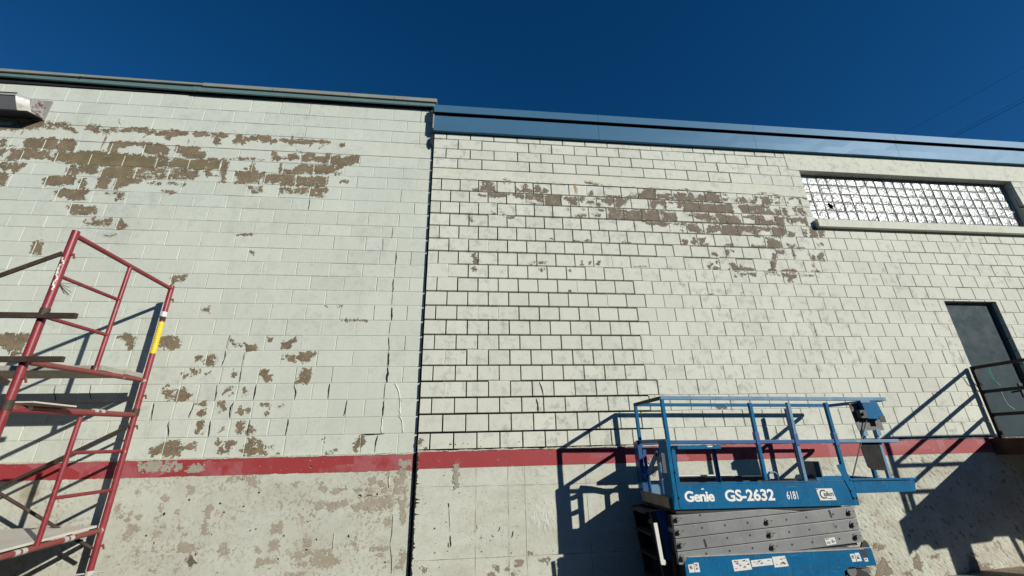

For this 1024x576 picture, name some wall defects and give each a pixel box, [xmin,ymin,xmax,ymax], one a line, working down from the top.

peeling [0,121,360,237]
peeling [465,178,825,283]
peeling [158,335,182,350]
crack [151,336,256,437]
peeling [230,336,317,385]
crack [362,231,403,452]
peeling [114,354,284,574]
peeling [352,435,367,453]